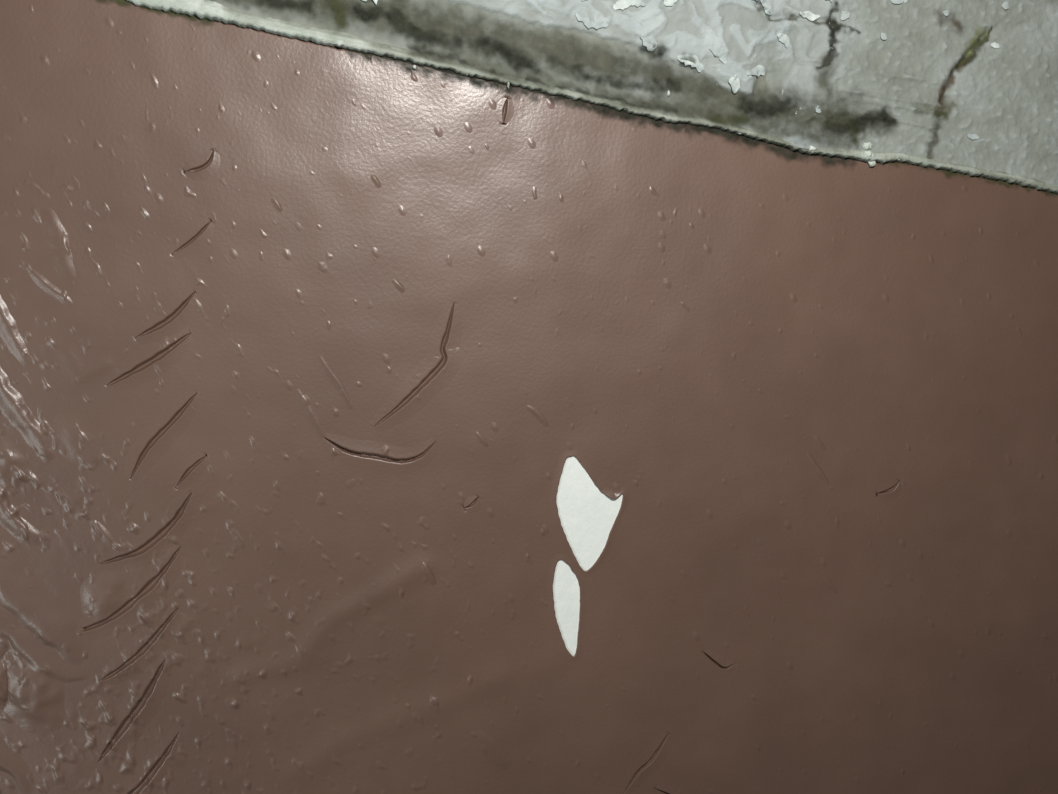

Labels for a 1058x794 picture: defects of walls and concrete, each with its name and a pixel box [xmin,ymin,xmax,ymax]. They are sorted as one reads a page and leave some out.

damp [101,0,212,23]
crack [496,98,514,123]
damp [233,0,896,164]
spalling [127,0,1058,195]
crack [757,2,860,94]
damp [928,166,1032,190]
crack [169,218,215,259]
crack [103,288,200,391]
crack [319,301,462,475]
crack [76,389,209,794]
peeling [546,449,630,663]